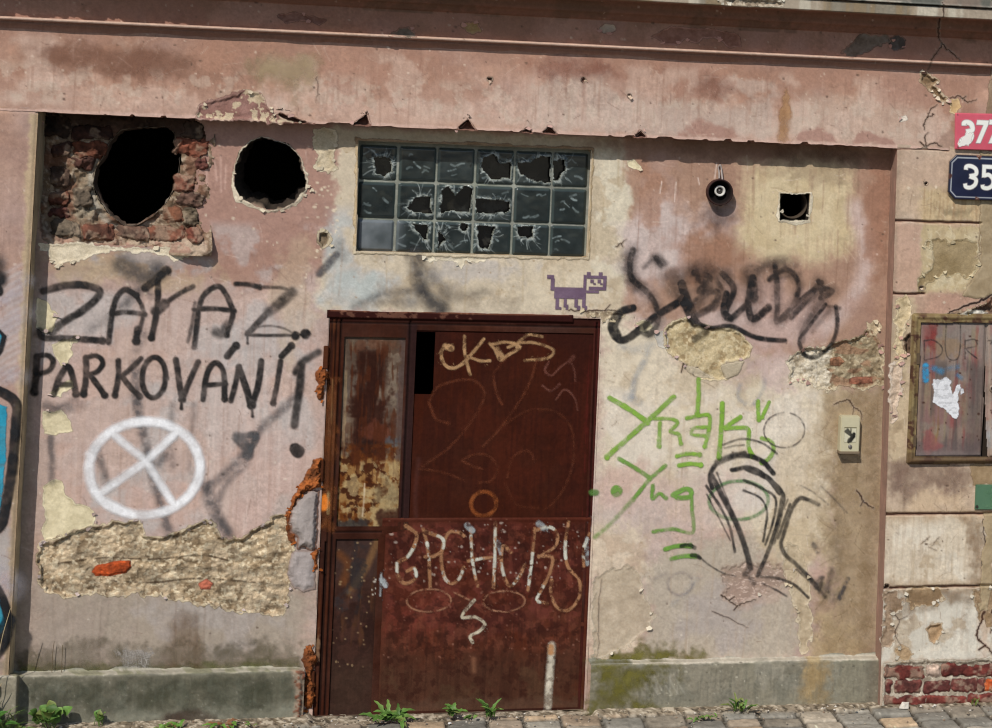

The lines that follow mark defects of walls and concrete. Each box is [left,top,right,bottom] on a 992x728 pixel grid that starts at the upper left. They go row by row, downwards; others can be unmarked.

peeling [836,32,906,58]
crack [928,2,960,69]
spalling [349,114,371,127]
spalling [919,69,962,114]
crack [920,95,977,147]
flaking render [38,89,339,268]
spalling [634,316,753,381]
spalling [785,238,981,424]
crack [948,294,992,314]
spalling [35,479,295,617]
flaking render [879,583,992,706]
crack [975,610,992,653]